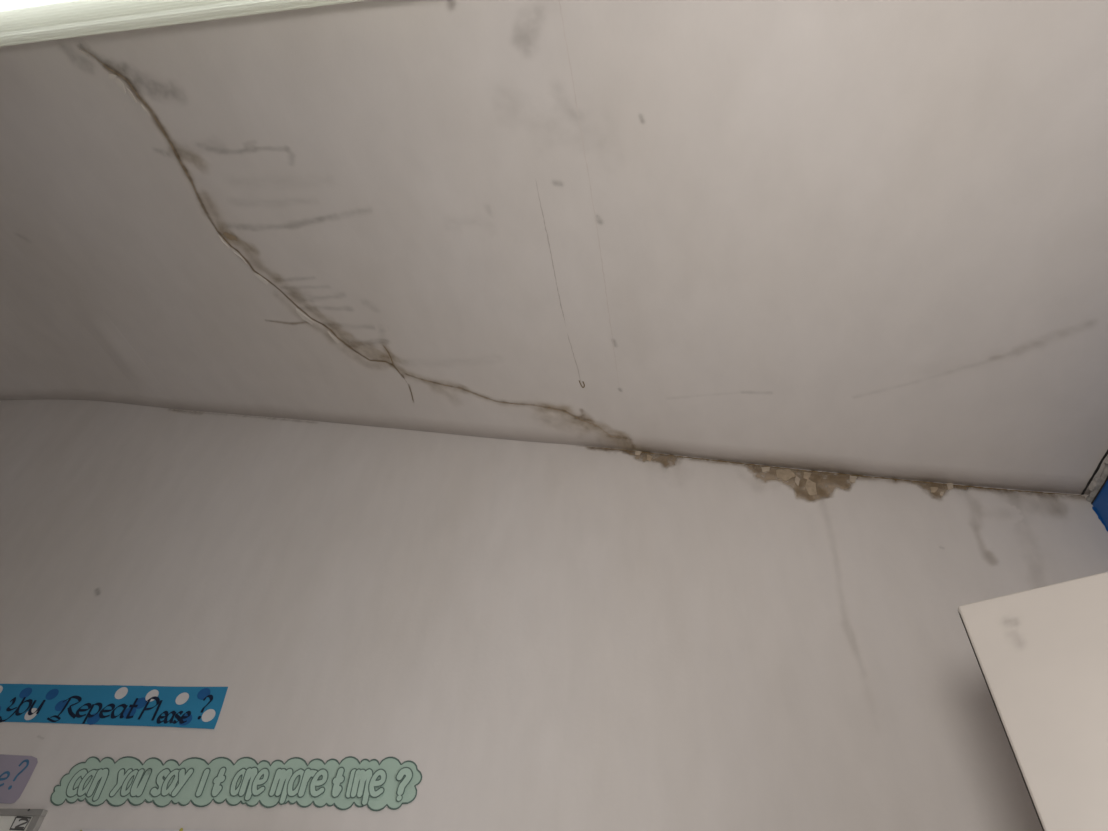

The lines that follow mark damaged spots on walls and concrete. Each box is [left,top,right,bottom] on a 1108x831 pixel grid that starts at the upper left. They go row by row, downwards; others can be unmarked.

crack [78,47,1085,497]
spalling [621,449,677,466]
spalling [748,466,857,501]